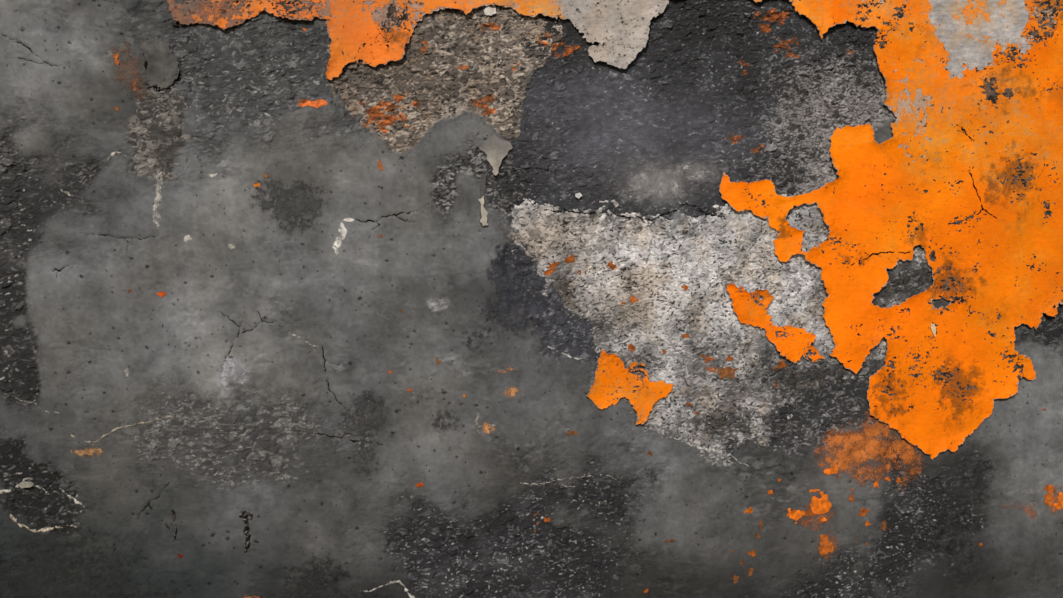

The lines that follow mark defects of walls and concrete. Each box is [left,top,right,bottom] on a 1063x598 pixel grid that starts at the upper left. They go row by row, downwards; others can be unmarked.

peeling [951,0,991,30]
spalling [0,0,394,543]
crack [220,312,274,388]
spalling [1014,303,1063,366]
spalling [880,428,900,454]
spalling [735,439,1017,598]
peeling [1044,484,1054,507]